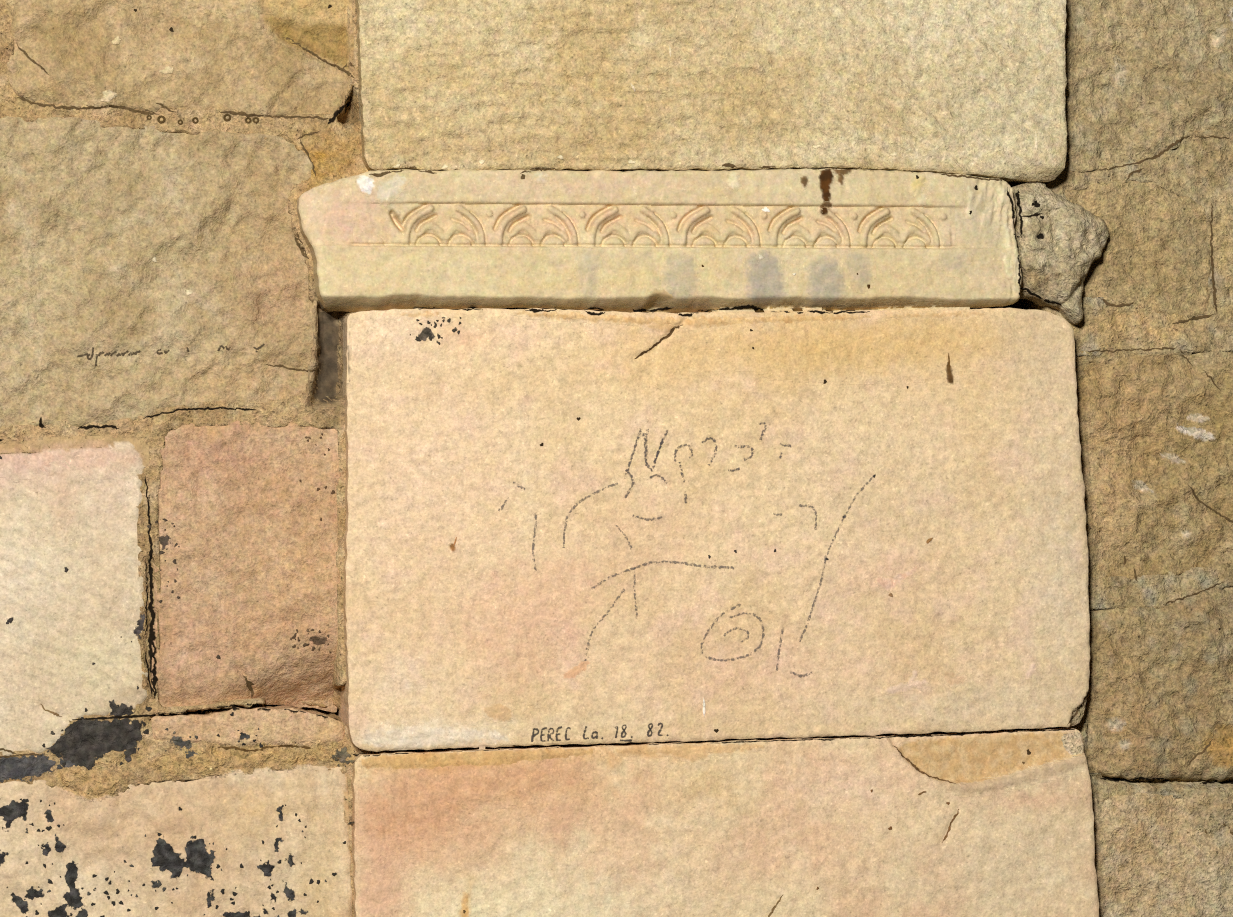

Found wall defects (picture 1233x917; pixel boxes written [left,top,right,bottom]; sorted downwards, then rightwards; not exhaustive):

rust [799,164,854,218]
crack [524,305,870,359]
damp [0,699,152,783]
spalling [894,689,1089,805]
damp [0,722,607,917]